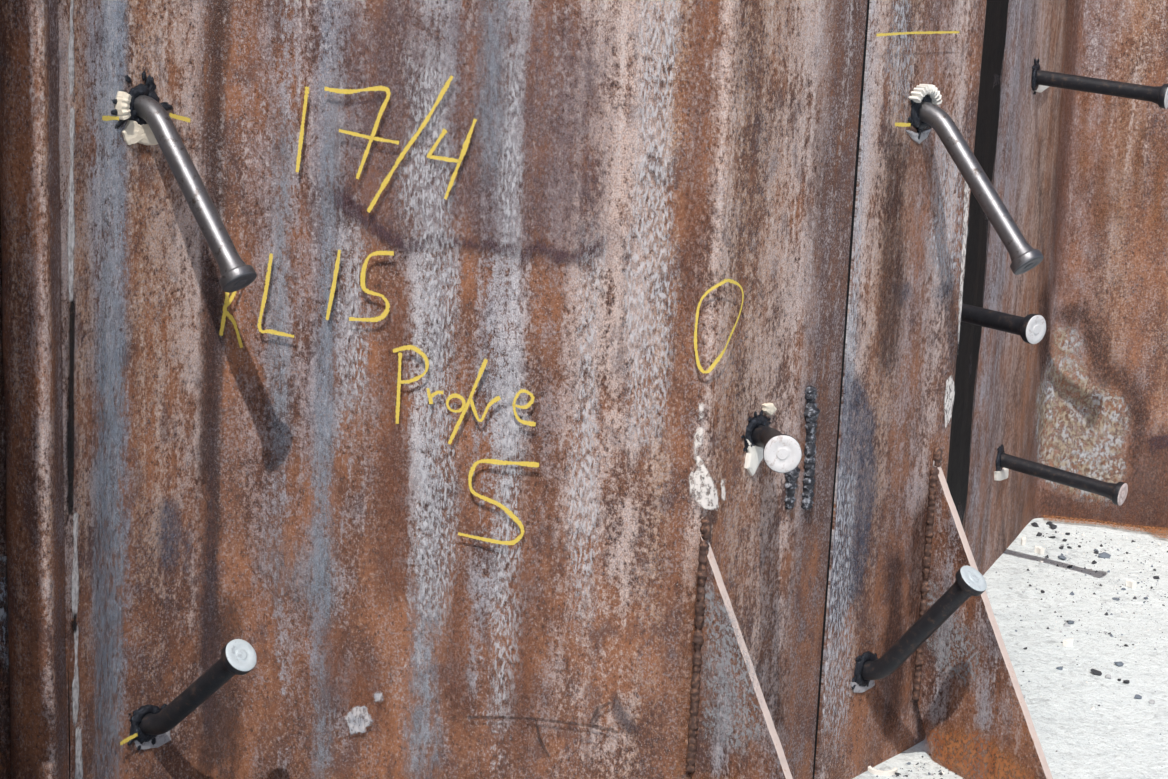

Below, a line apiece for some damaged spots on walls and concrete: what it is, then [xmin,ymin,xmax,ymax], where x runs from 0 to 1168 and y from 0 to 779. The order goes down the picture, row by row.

corrosion [1042,515,1168,539]
corrosion [925,724,1035,779]